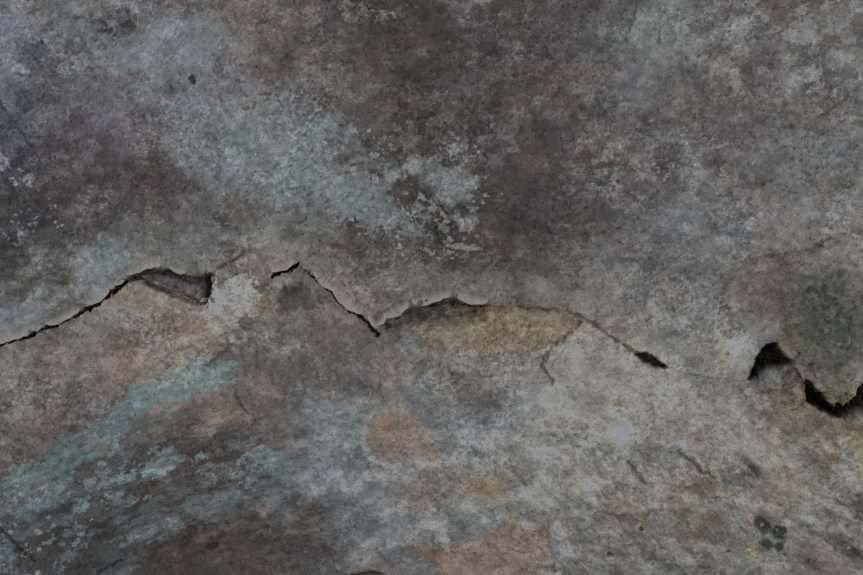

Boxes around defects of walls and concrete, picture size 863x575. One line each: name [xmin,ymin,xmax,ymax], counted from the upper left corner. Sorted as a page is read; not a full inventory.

crack [0,261,186,346]
crack [208,248,252,278]
crack [269,257,489,338]
crack [717,230,860,322]
crack [204,336,242,367]
crack [534,306,639,389]
crack [233,384,249,415]